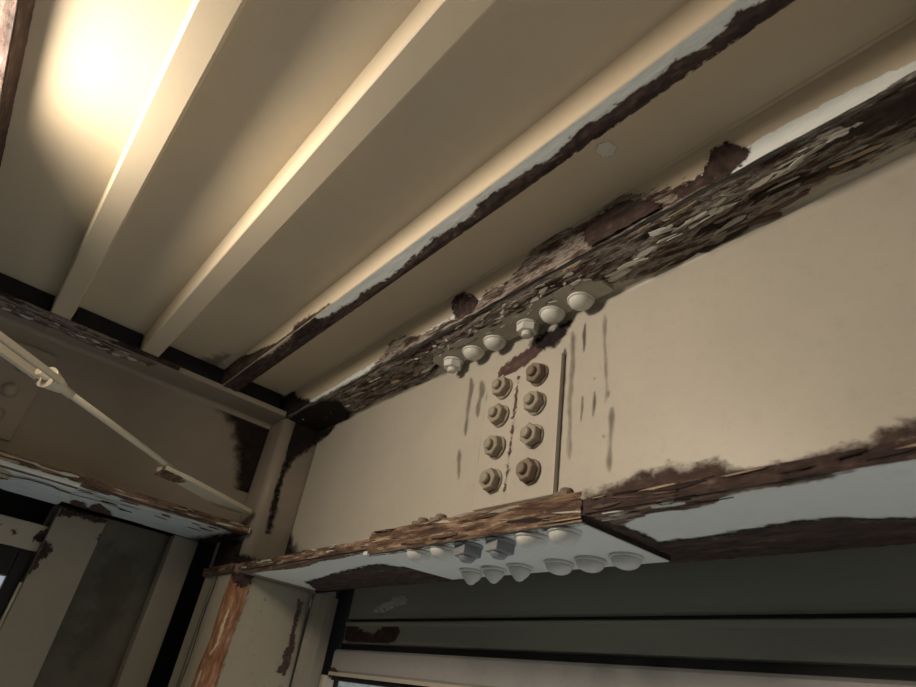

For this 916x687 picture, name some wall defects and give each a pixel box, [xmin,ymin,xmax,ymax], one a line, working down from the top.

peeling [315,0,767,319]
peeling [300,60,916,420]
corrosion [498,320,571,492]
corrosion [28,527,53,574]
peeling [0,468,230,539]
corrosion [191,543,339,687]
corrosion [265,422,335,535]
corrosion [345,626,401,644]